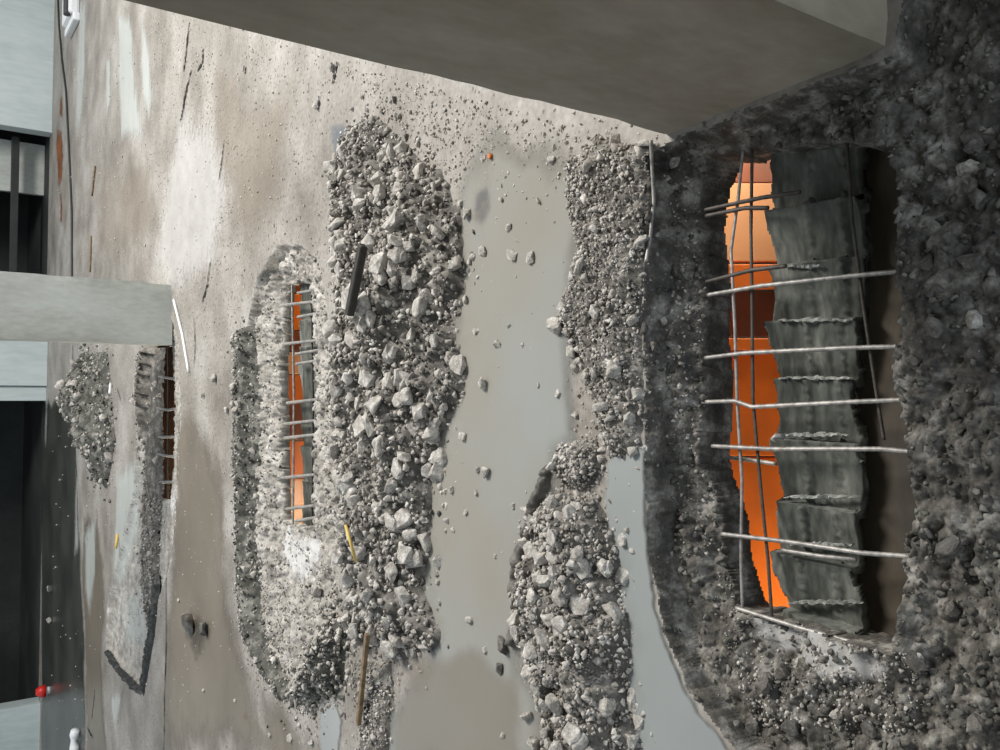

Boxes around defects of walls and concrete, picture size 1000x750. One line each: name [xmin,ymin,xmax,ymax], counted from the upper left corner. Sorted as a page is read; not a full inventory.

crack [180,25,204,120]
spalling [106,436,153,695]
spalling [156,320,181,601]
spalling [246,243,341,688]
spalling [642,0,1000,750]